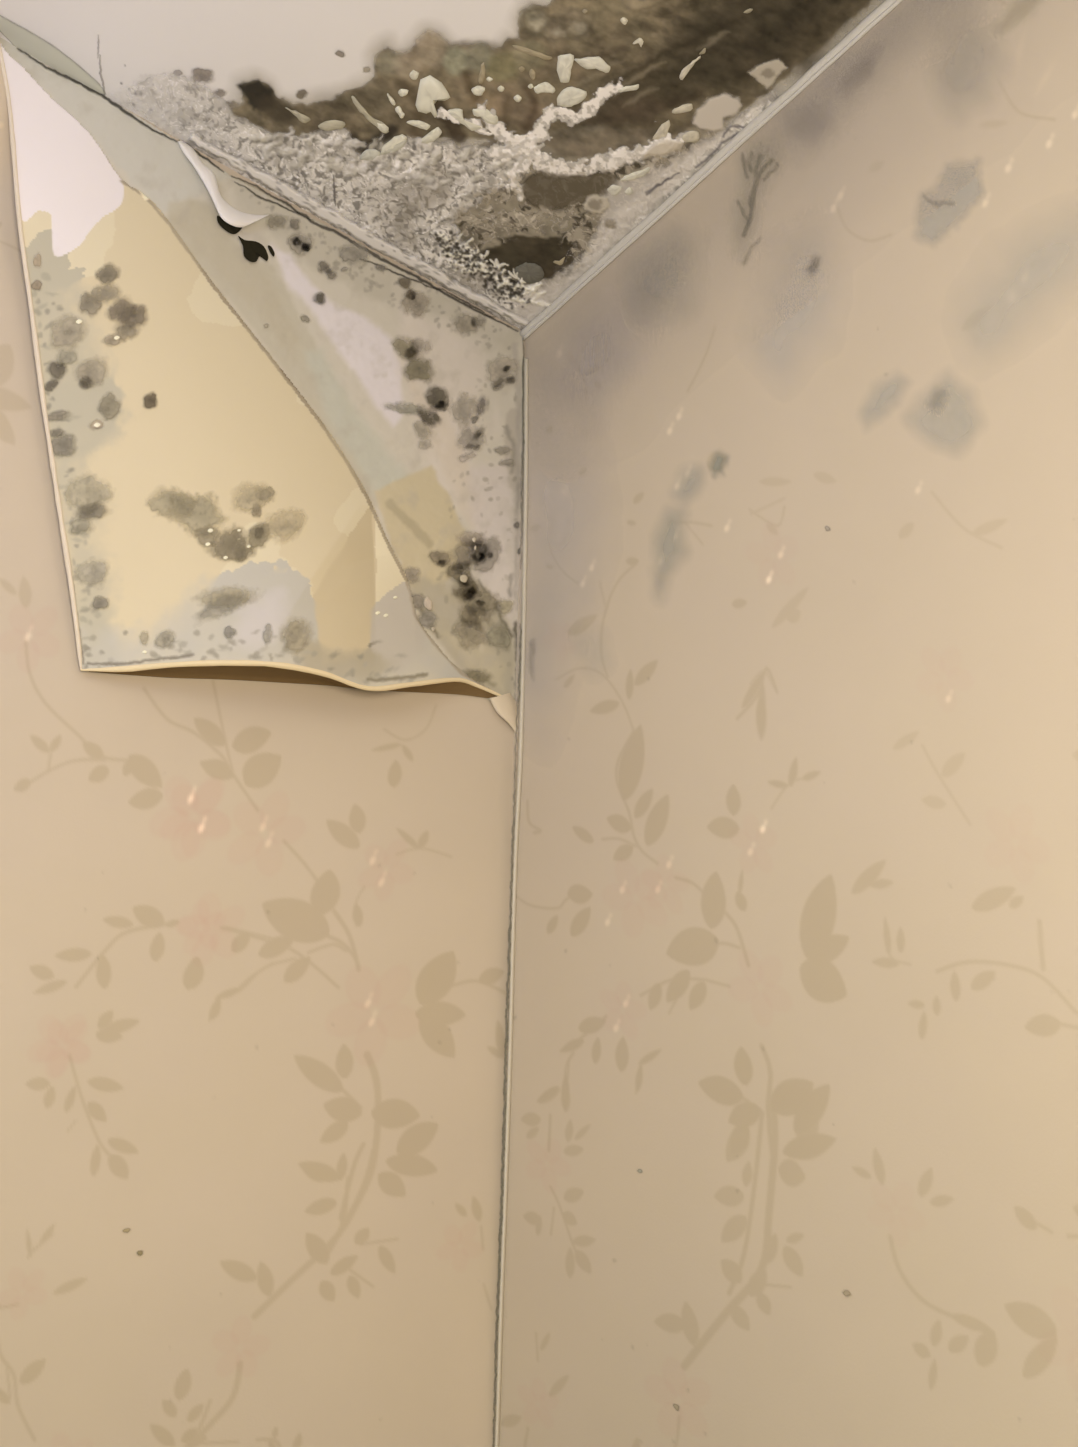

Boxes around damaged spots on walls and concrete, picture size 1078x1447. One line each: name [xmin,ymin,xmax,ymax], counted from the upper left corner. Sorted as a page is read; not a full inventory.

water stain [121,0,881,332]
mould [45,265,145,429]
peeling [0,16,523,702]
mould [48,411,74,455]
mould [144,393,157,408]
water stain [387,339,517,466]
mould [65,477,111,533]
mould [149,486,303,561]
mould [78,562,108,608]
mould [200,588,249,638]
mould [430,532,513,648]
mould [466,670,489,682]